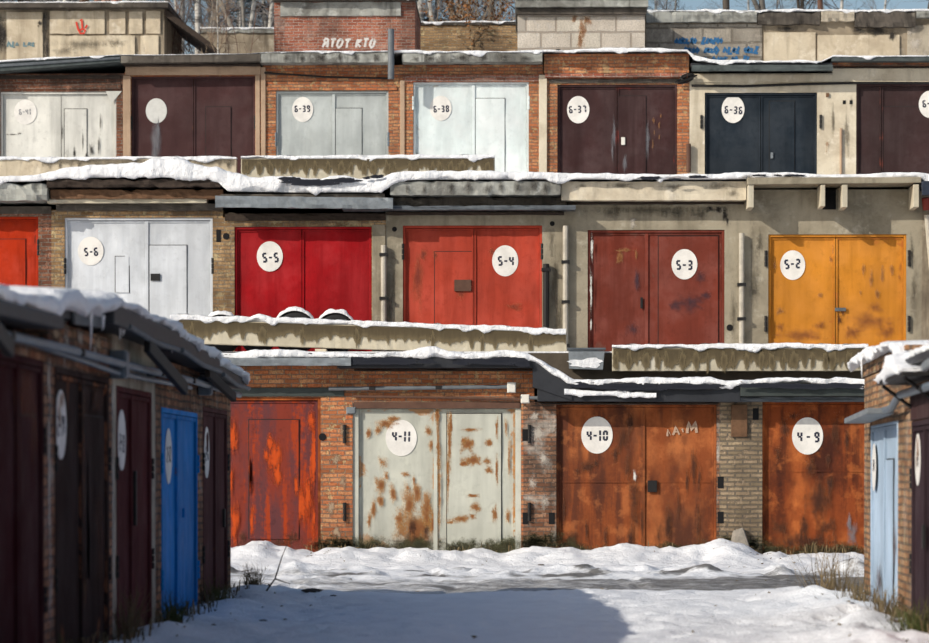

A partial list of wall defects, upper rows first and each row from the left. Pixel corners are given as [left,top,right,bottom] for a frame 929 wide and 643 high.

leakage [179,306,566,351]
leakage [612,348,863,372]
rust [366,409,510,547]
rust [567,524,588,547]
rust [627,485,644,544]
rust [658,454,700,540]
rust [776,461,837,548]